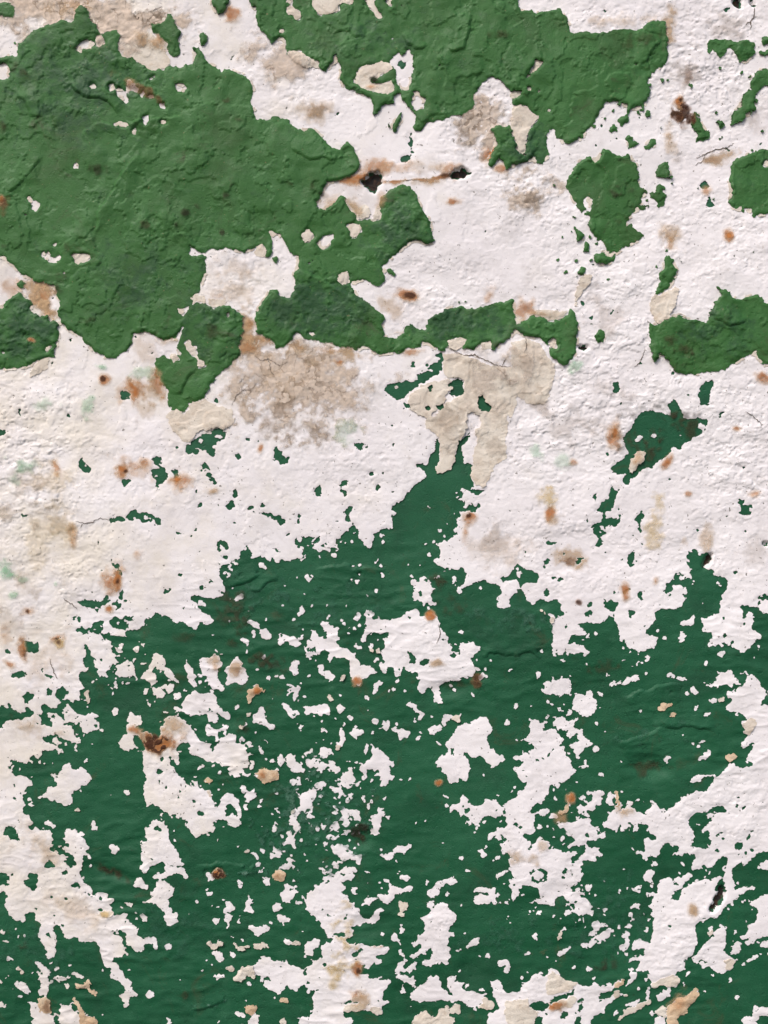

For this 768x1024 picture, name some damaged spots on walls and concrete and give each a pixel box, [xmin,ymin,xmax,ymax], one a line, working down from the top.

rust [671,96,696,124]
rust [340,161,401,184]
rust [417,164,454,183]
rust [398,290,417,301]
rust [102,571,121,612]
peeling [240,574,492,704]
peeling [282,694,345,733]
rust [128,719,183,755]
peeling [38,758,92,806]
peeling [391,670,768,1024]
peeling [244,849,298,926]
peeling [28,961,98,1024]